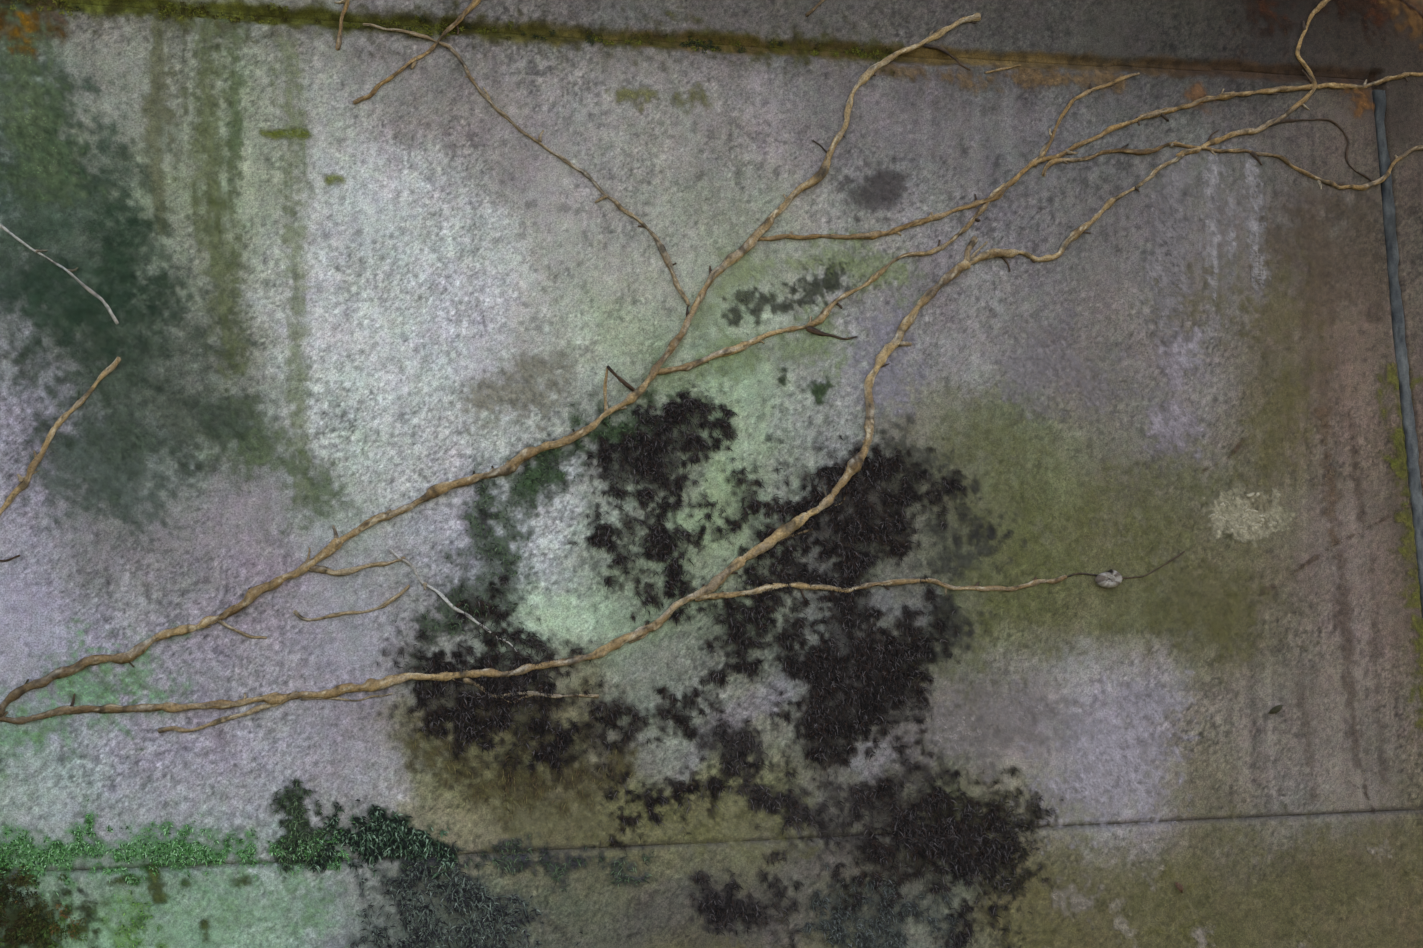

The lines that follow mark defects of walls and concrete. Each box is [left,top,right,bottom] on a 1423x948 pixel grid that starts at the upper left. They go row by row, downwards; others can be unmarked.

leakage [0,6,107,205]
leakage [144,12,245,376]
leakage [209,399,347,513]
leakage [269,309,1193,948]